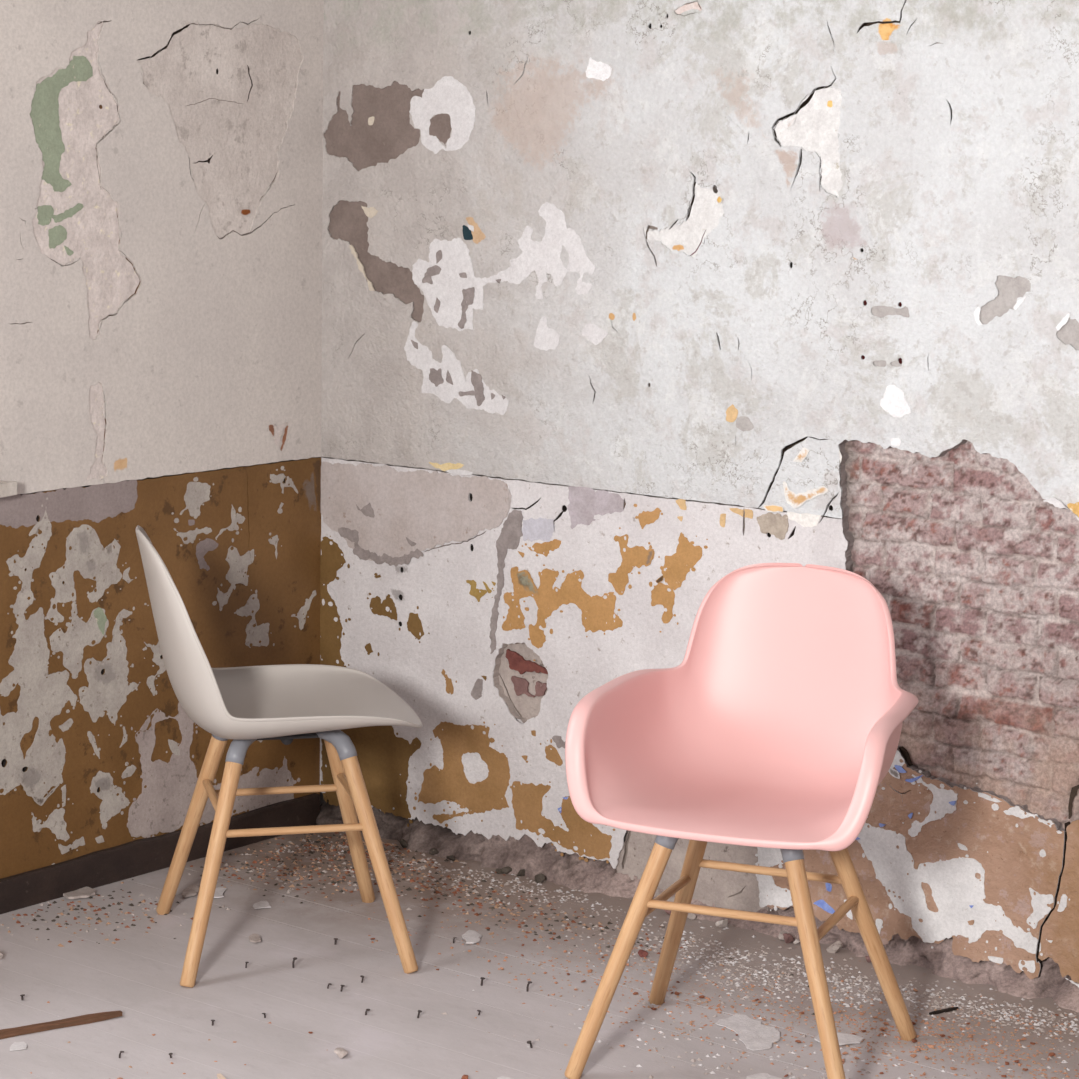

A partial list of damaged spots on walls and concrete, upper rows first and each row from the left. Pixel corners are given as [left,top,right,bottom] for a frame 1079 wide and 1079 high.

crack [858,1,913,32]
peeling [30,21,141,340]
flaking render [324,81,424,171]
flaking render [328,200,424,323]
peeling [0,480,198,865]
peeling [171,477,275,648]
peeling [316,739,344,825]
flaking render [341,721,657,898]
flaking render [291,461,708,766]
flaking render [687,842,800,944]
flaking render [720,437,1079,1012]
crack [1036,785,1079,962]